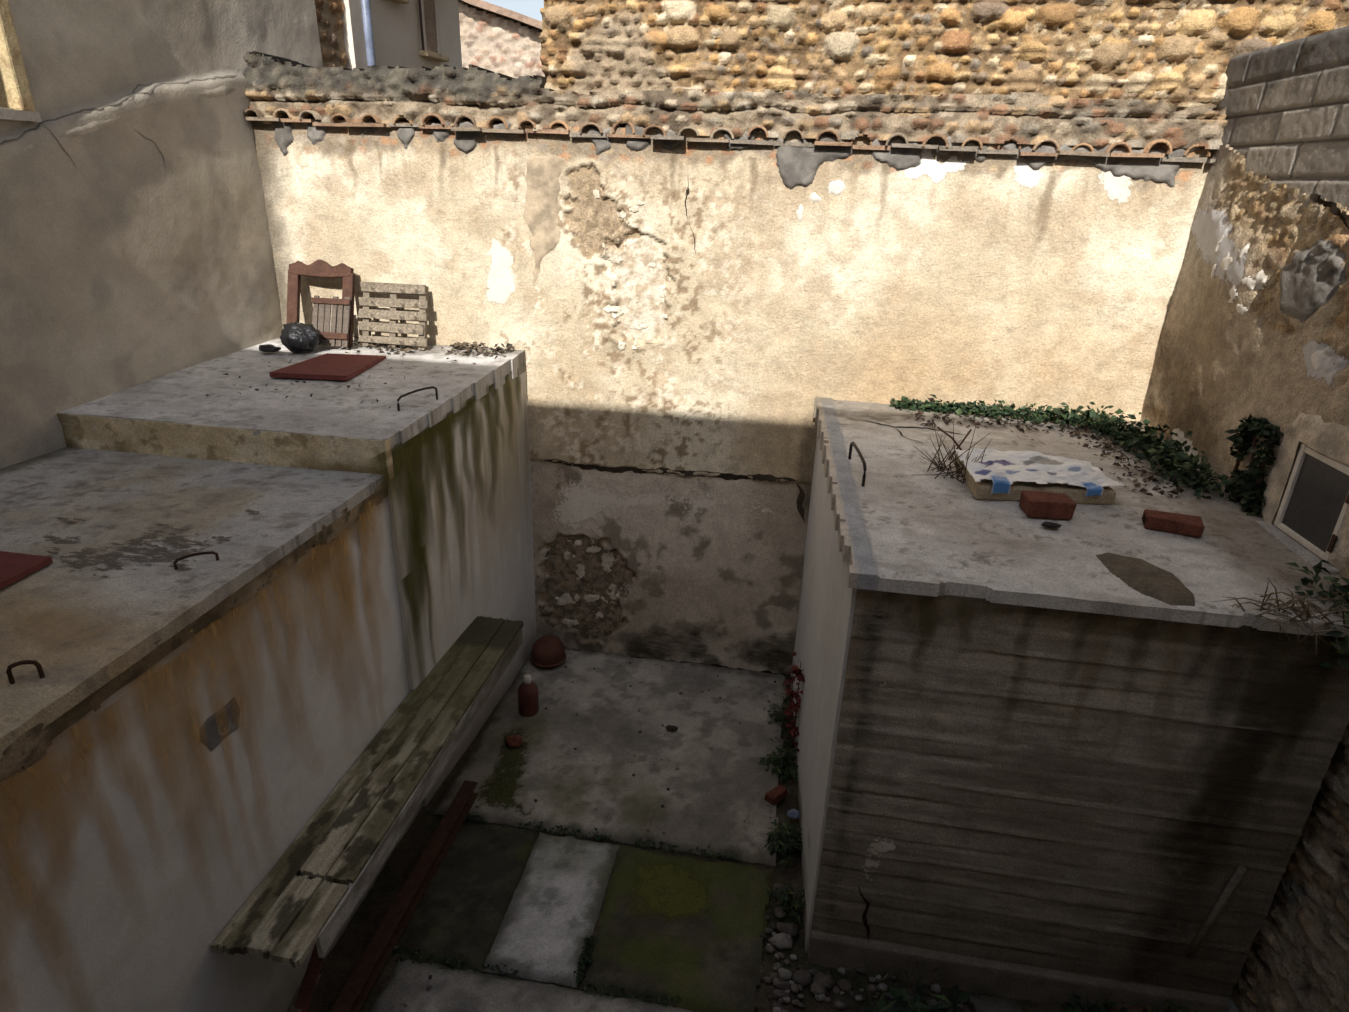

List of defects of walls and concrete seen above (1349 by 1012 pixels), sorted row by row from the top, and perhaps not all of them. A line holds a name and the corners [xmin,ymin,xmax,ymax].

crack [0,75,236,177]
peeling [486,238,516,304]
peeling [568,168,672,351]
peeling [1191,201,1268,315]
crack [1309,194,1349,229]
leakage [375,370,520,643]
crack [544,459,805,521]
flaking render [536,535,636,648]
crack [858,887,870,943]